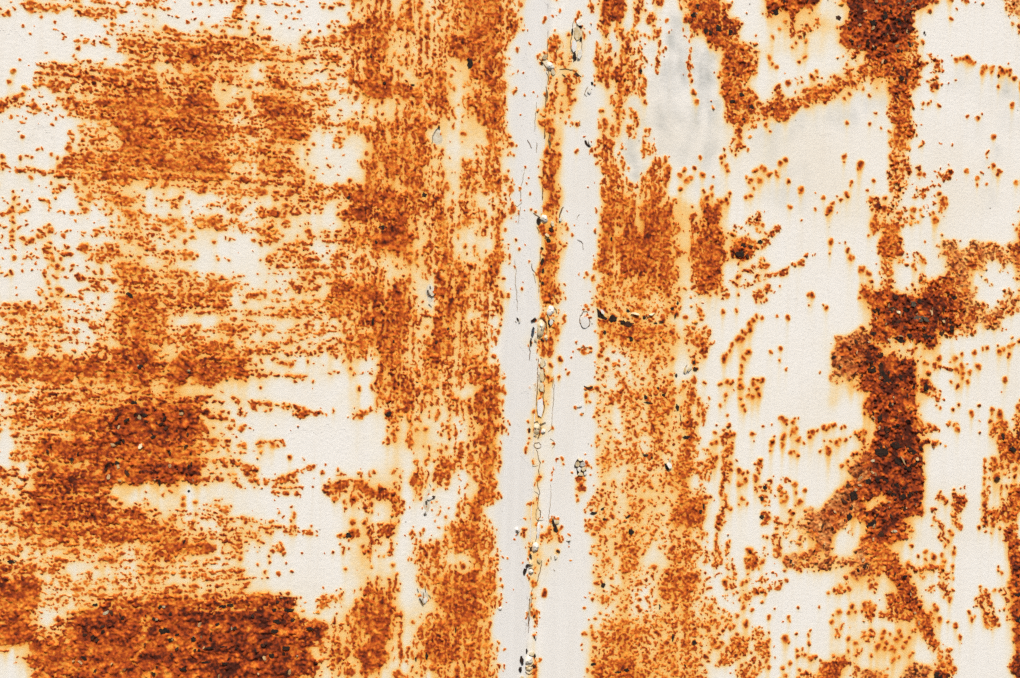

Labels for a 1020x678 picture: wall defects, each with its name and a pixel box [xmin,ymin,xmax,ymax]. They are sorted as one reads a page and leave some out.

peeling [570,19,582,62]
corrosion [0,0,452,678]
corrosion [323,0,1020,678]
peeling [536,357,555,417]
spalling [574,458,587,476]